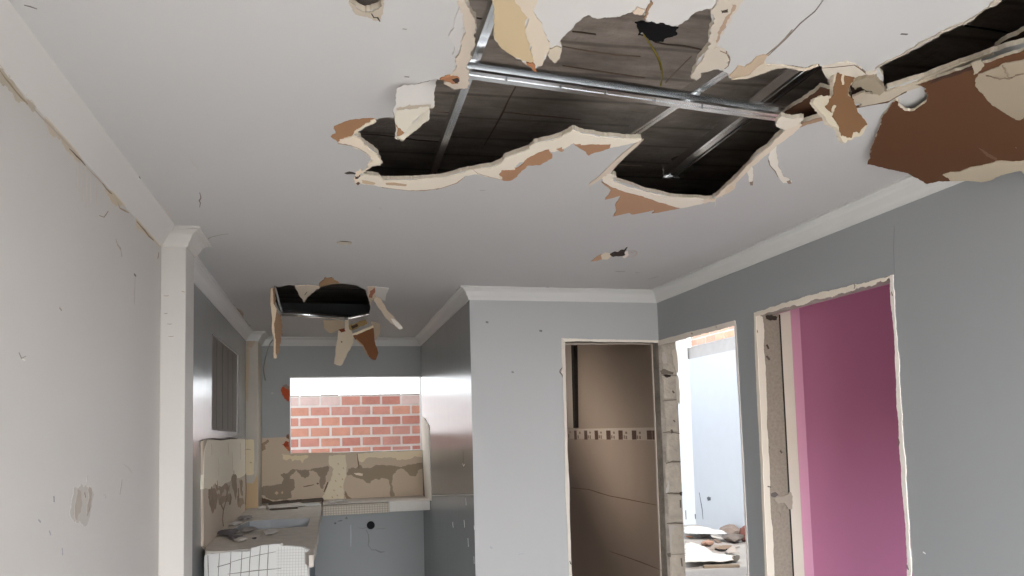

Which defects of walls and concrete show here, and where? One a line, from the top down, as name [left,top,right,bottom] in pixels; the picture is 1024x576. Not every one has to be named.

spalling [444,0,476,90]
spalling [690,0,1002,107]
spalling [338,112,804,208]
spalling [601,247,629,260]
spalling [295,285,320,302]
peeling [367,286,389,304]
spalling [262,463,423,500]